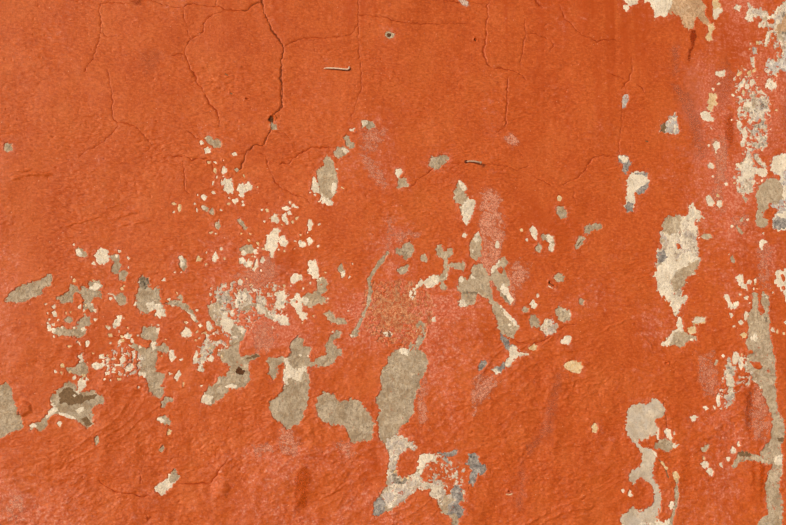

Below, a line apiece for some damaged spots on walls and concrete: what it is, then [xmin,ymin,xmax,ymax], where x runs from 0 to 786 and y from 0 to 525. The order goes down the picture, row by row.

crack [79,0,465,202]
spalling [309,120,375,206]
crack [446,0,615,134]
spalling [618,155,650,213]
spalling [623,0,723,41]
peeling [700,1,786,250]
spalling [0,244,184,438]
spalling [174,180,537,525]
spalling [522,294,572,345]
spalling [620,398,680,525]
spalling [653,194,722,348]
spalling [700,268,786,525]